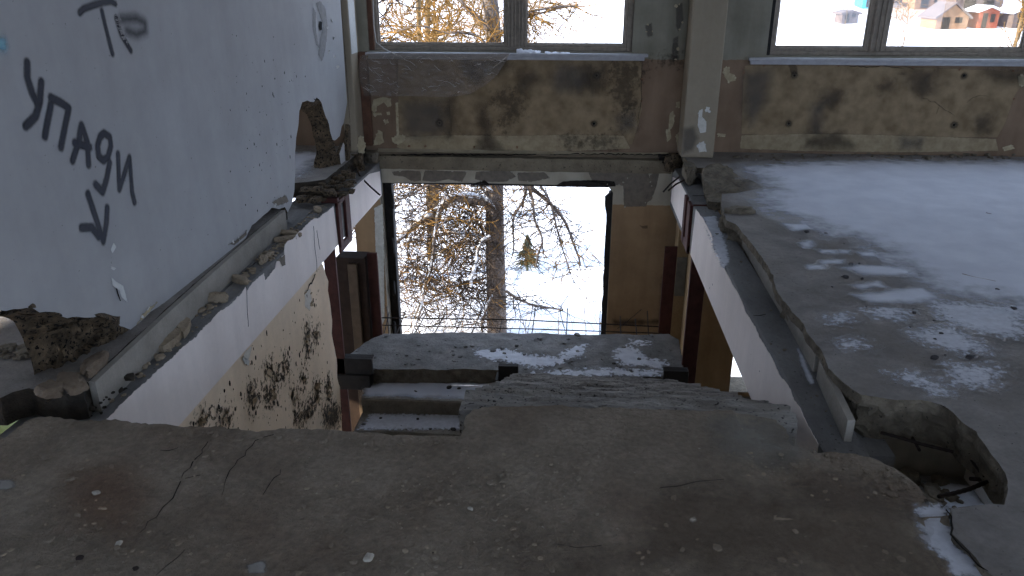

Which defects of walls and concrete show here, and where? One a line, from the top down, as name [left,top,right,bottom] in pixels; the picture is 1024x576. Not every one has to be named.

spalling [301,99,337,168]
peeling [697,107,726,152]
spalling [0,302,157,404]
crack [138,442,208,534]
spalling [937,460,989,499]
crack [946,509,988,571]